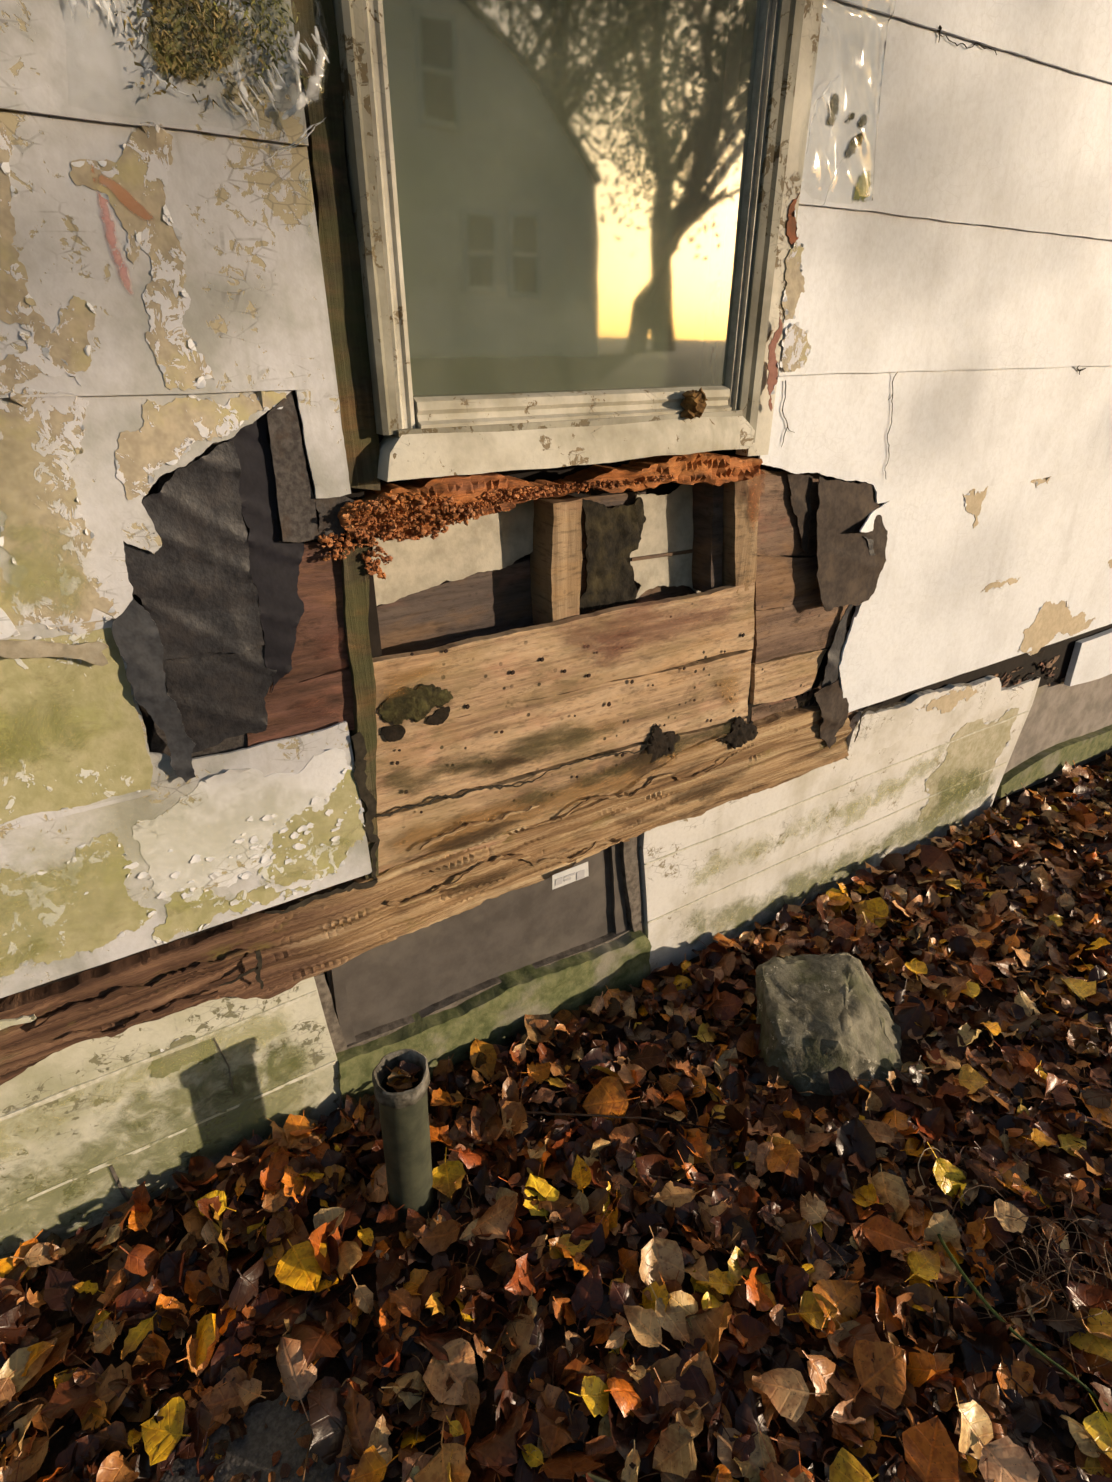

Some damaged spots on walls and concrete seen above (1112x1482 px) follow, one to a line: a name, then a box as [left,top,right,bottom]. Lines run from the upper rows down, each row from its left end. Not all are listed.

peeling [69,121,287,500]
peeling [767,193,812,411]
crack [884,372,898,478]
spalling [318,457,681,579]
peeling [992,600,1095,689]
leakage [437,791,551,852]
leakage [387,728,615,794]
leakage [661,771,744,811]
leakage [939,770,979,801]
spalling [915,686,1019,823]
leakage [453,869,518,895]
leakage [134,1048,299,1114]